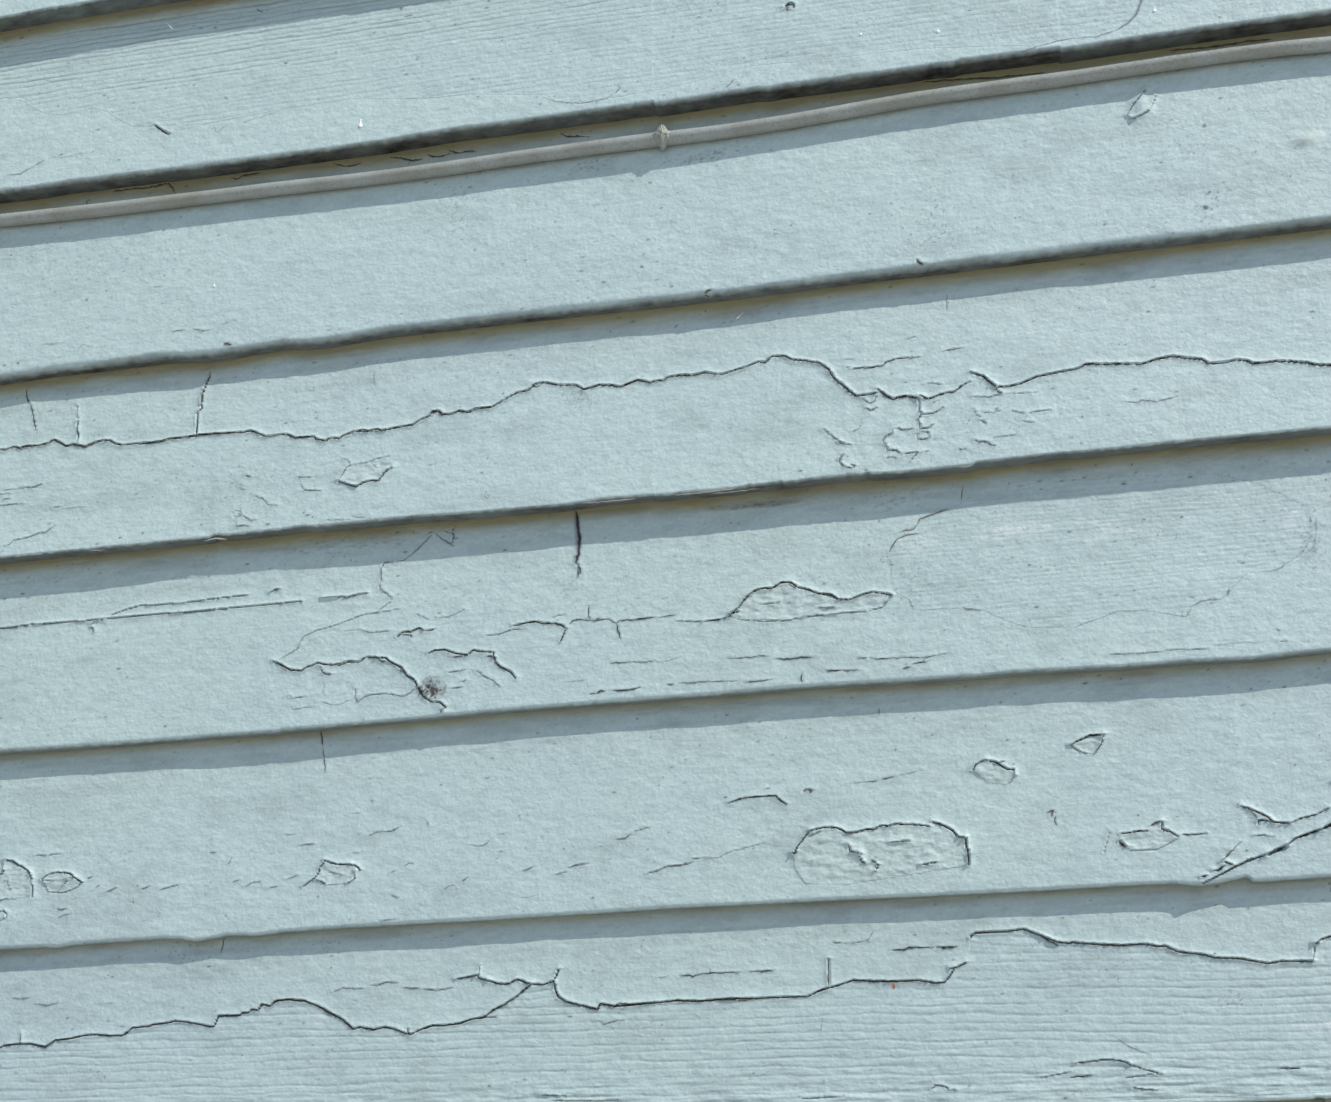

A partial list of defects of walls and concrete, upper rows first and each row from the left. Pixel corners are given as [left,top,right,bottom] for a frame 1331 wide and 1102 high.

peeling [339,457,392,487]
crack [574,512,582,577]
crack [275,529,946,709]
peeling [794,822,969,885]
crack [1203,807,1331,884]
peeling [0,860,81,920]
peeling [0,929,1331,1102]